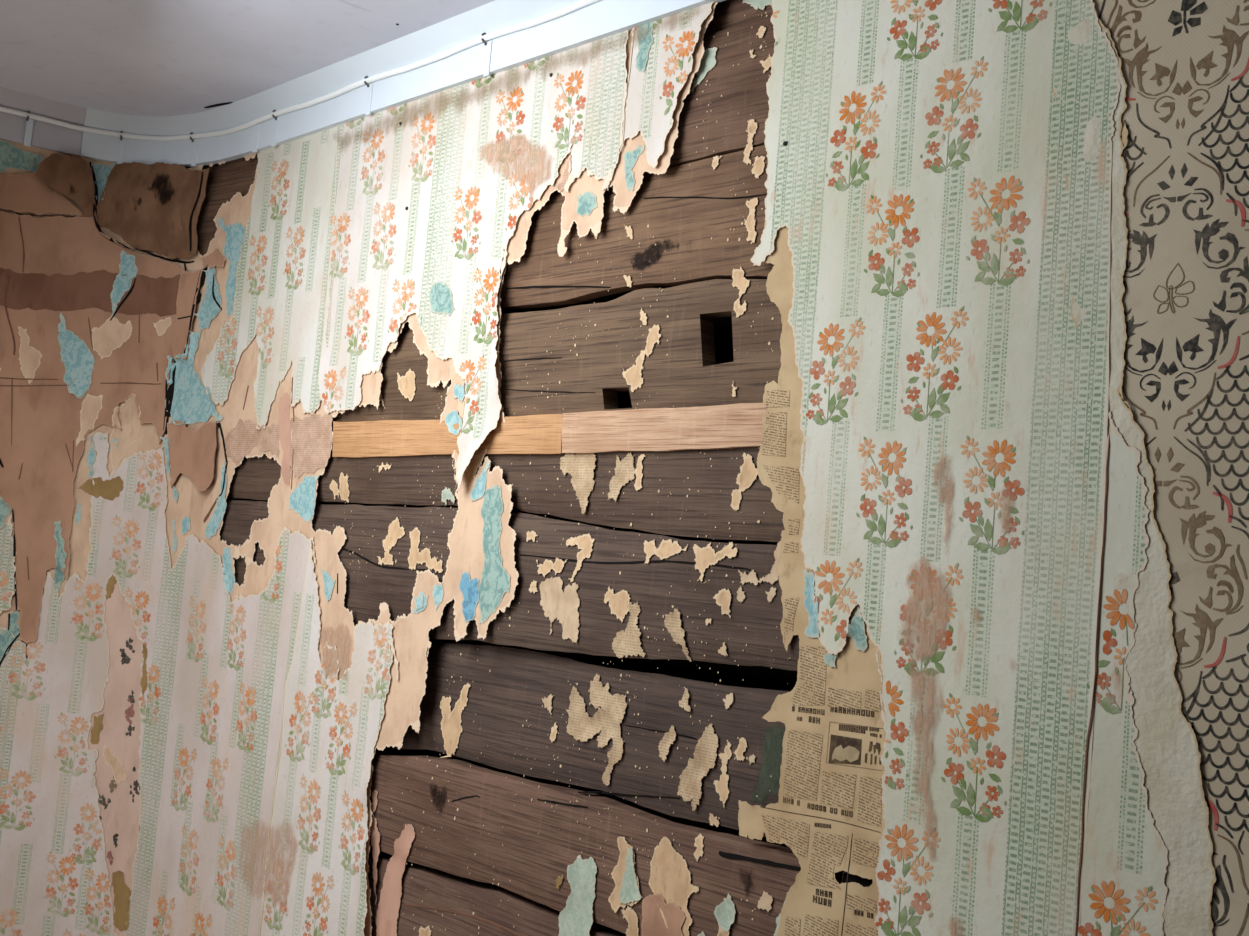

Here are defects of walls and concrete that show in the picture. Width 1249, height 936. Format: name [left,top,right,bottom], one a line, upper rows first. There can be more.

crack [506,283,610,291]